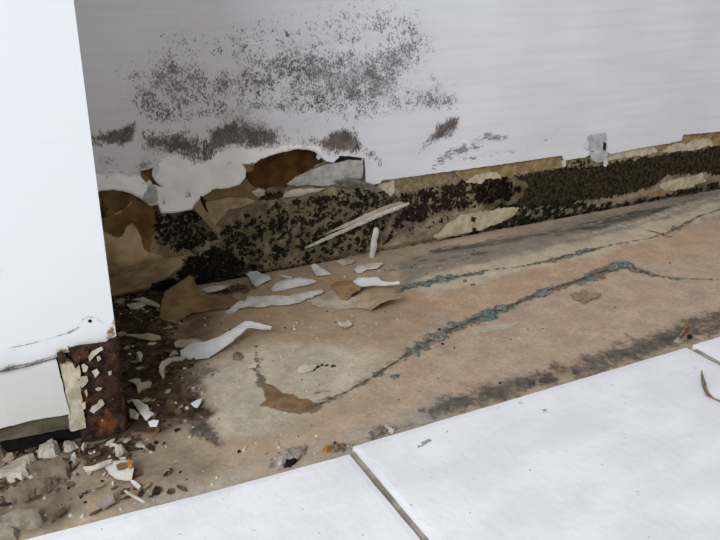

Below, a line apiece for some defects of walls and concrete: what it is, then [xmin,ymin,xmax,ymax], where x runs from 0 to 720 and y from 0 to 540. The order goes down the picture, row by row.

water stain [132,11,421,165]
water stain [91,119,280,164]
water stain [423,117,459,149]
peeling [584,133,713,167]
flaking render [96,144,331,295]
peeling [305,180,409,248]
peeling [353,263,400,287]
water stain [77,145,720,464]
crack [318,209,720,405]